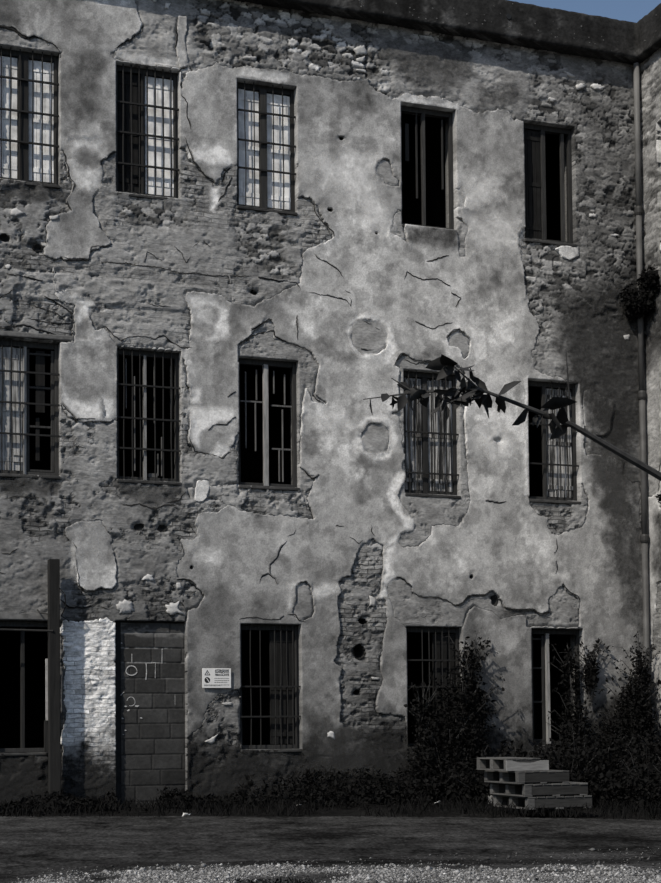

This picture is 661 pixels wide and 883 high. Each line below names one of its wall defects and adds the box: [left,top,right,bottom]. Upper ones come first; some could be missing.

peeling [0,27,62,61]
crack [65,240,380,330]
peeling [111,0,661,548]
crack [404,255,464,338]
crack [101,327,189,348]
crack [240,315,312,353]
crack [394,353,432,365]
peeling [0,148,333,732]
crack [259,530,296,584]
crack [395,576,490,606]
peeling [334,539,580,736]
peeling [185,689,241,763]